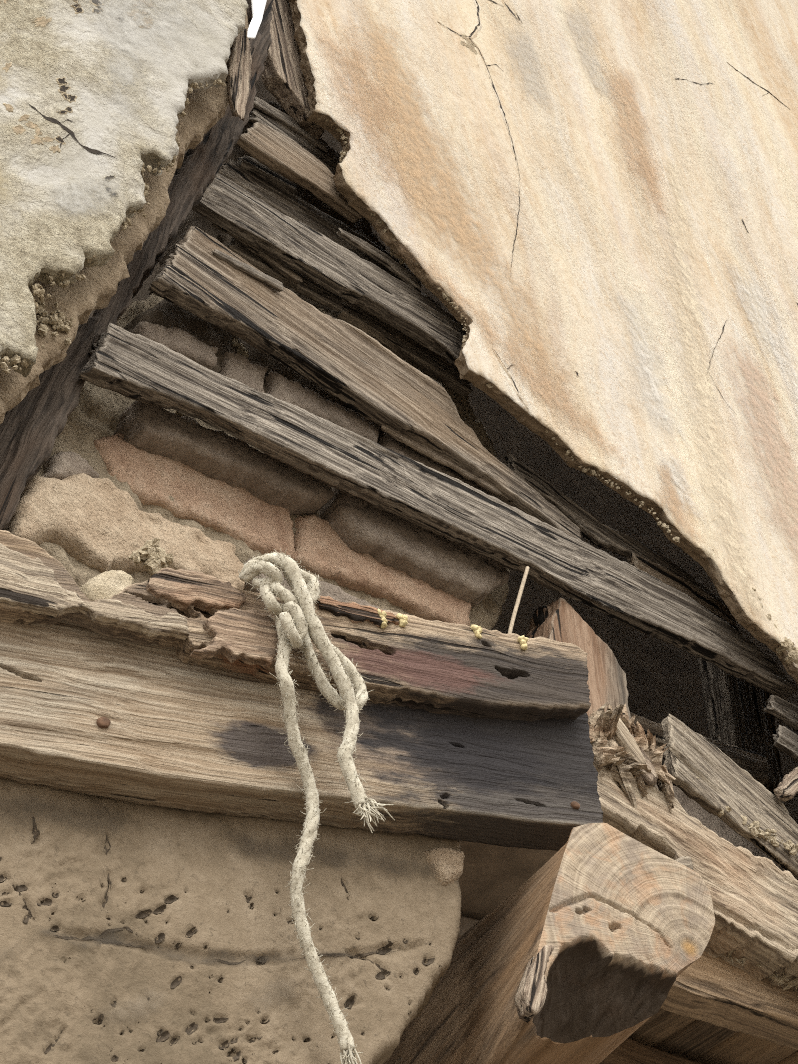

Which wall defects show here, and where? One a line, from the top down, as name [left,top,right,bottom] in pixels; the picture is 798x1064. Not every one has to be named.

spalling [70,0,154,29]
spalling [56,77,77,114]
crack [28,103,119,160]
spalling [122,78,226,231]
crack [437,0,520,277]
spalling [31,254,112,348]
spalling [535,422,680,543]
spalling [752,587,798,665]
spalling [0,875,59,932]
spalling [102,890,197,948]
spalling [376,939,408,954]
spalling [376,958,442,990]